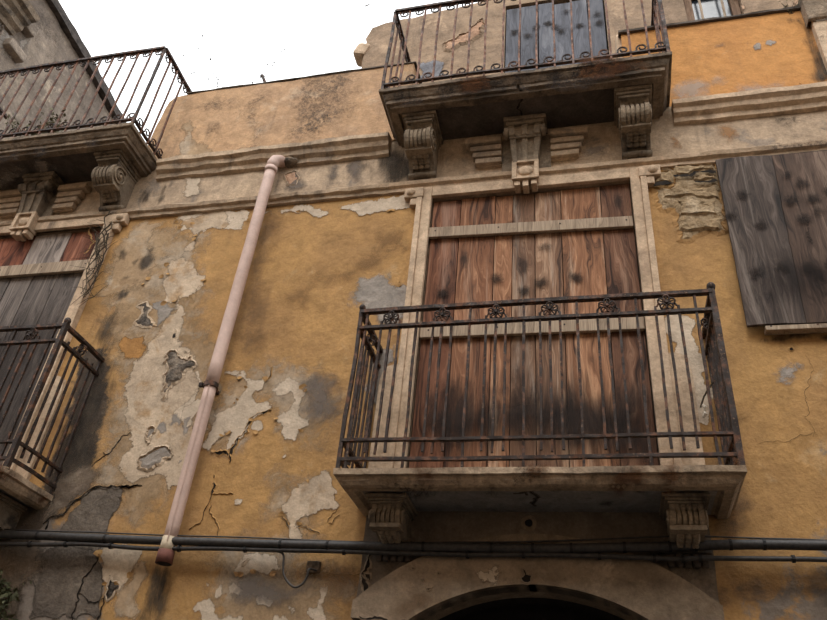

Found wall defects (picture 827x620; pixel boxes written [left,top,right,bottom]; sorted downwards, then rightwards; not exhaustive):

leakage [299,75,347,131]
peeling [340,195,410,216]
spalling [648,164,729,244]
peeling [352,275,407,324]
peeling [0,209,250,620]
peeling [201,360,342,456]
crack [759,355,817,444]
crack [43,433,142,530]
crack [189,409,271,536]
peeling [264,470,339,540]
crack [71,548,118,620]
peeling [193,551,356,620]